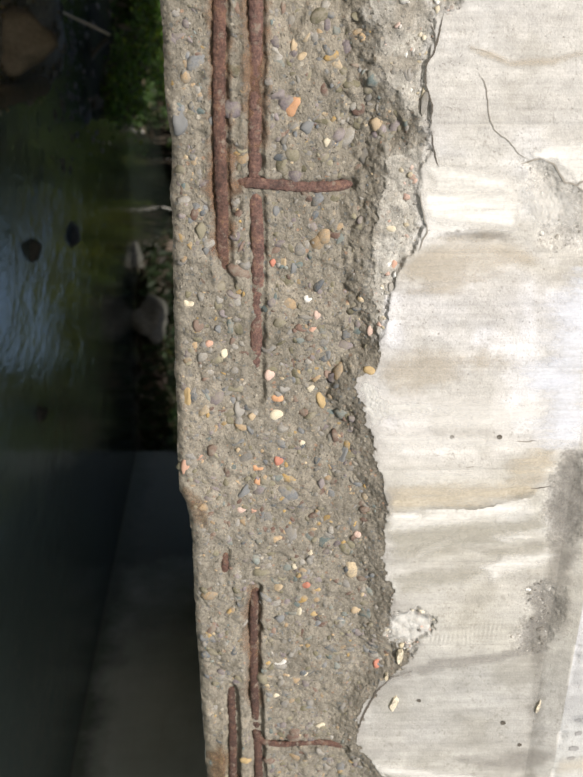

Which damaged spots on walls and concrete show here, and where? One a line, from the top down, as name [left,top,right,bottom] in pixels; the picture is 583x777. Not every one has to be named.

crack [479,74,583,191]
corrosion [207,156,217,208]
corrosion [226,148,240,197]
damp [534,144,583,177]
spalling [160,0,440,777]